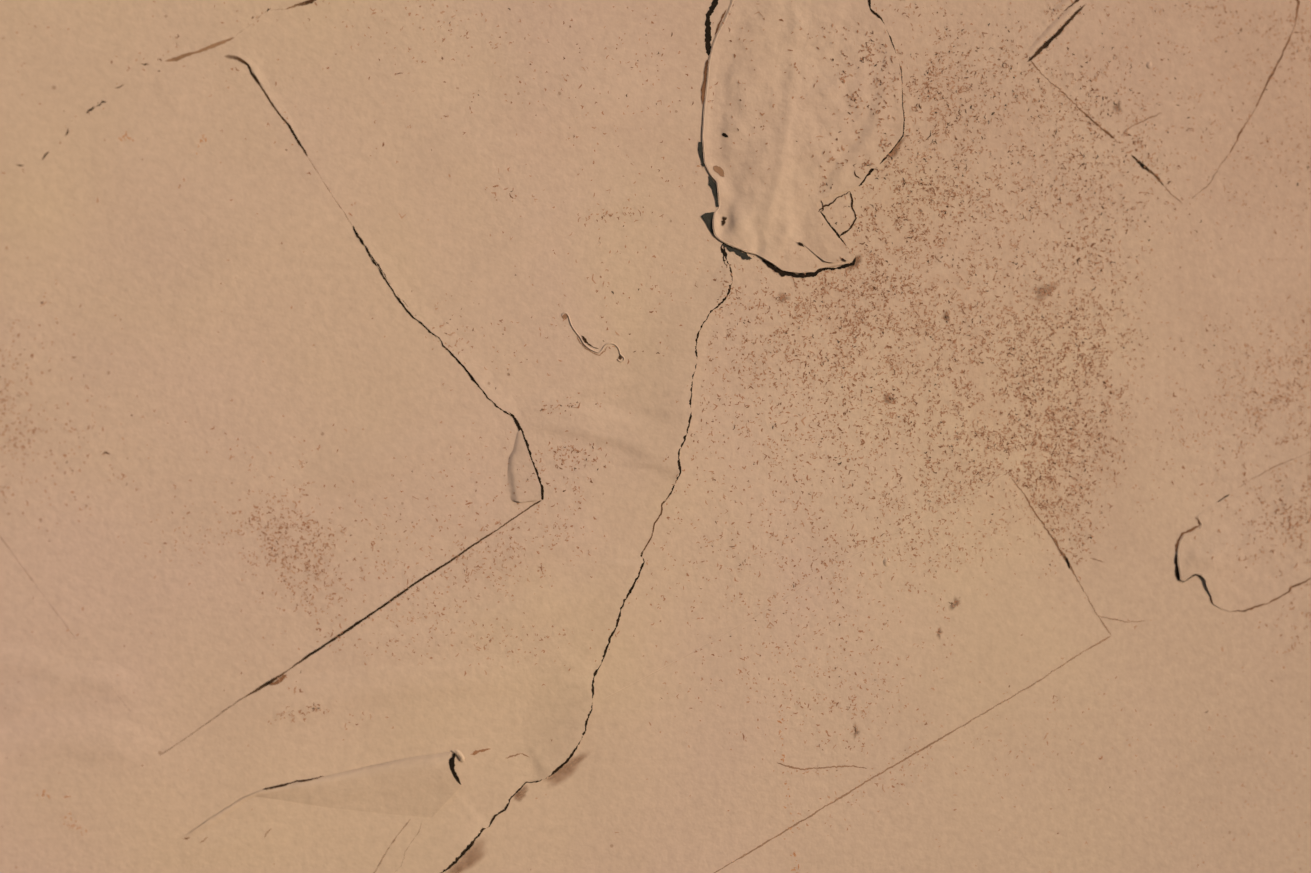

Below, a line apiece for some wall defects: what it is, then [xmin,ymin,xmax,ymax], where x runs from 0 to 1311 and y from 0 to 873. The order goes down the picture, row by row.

crack [705,0,718,56]
peeling [698,0,905,278]
crack [1031,0,1300,204]
crack [16,0,544,754]
crack [272,242,733,873]
peeling [1175,462,1311,612]